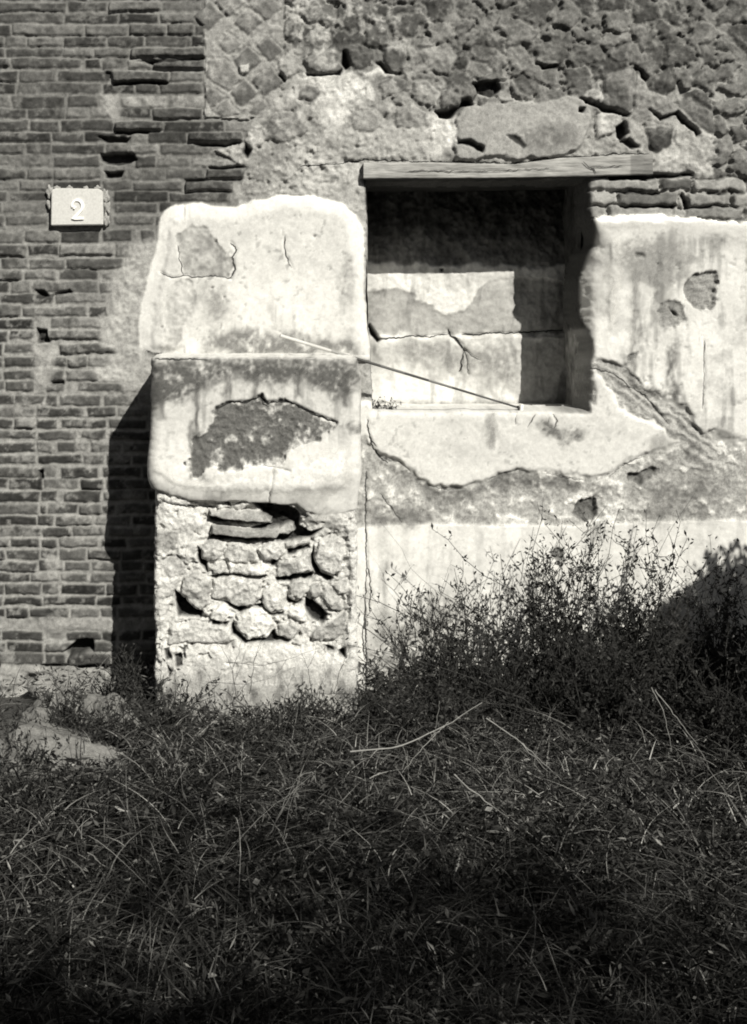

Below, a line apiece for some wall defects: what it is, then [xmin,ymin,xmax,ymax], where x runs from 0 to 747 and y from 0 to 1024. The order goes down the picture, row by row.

peeling [160,224,234,354]
crack [379,329,562,372]
spalling [657,271,720,329]
spalling [158,351,747,663]